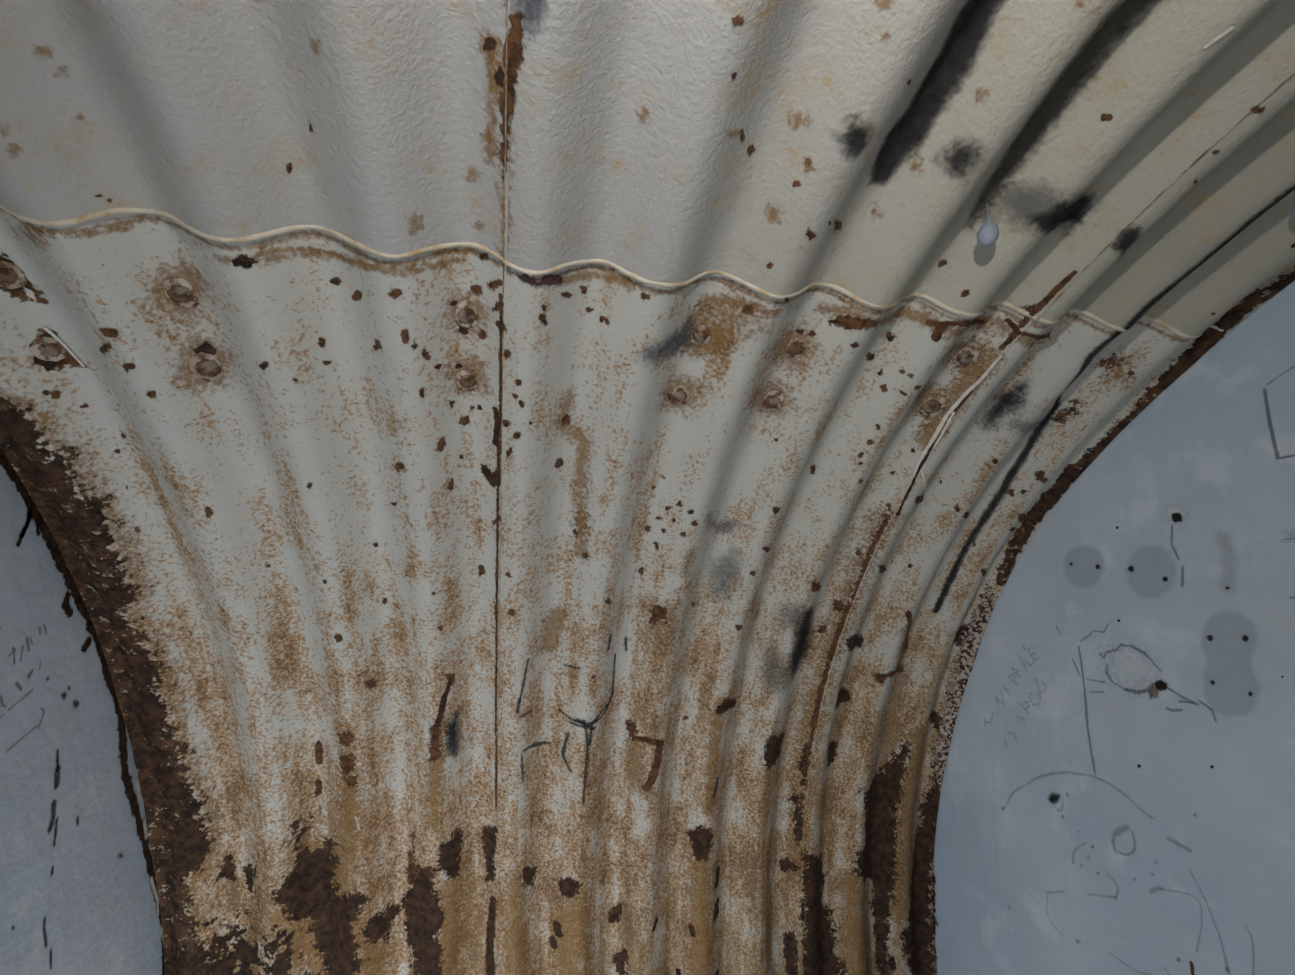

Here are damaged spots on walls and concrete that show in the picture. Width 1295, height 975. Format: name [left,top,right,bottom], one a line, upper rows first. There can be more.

rust [980,267,1295,598]
rust [0,390,538,975]
rust [608,903,627,923]
rust [755,504,943,975]